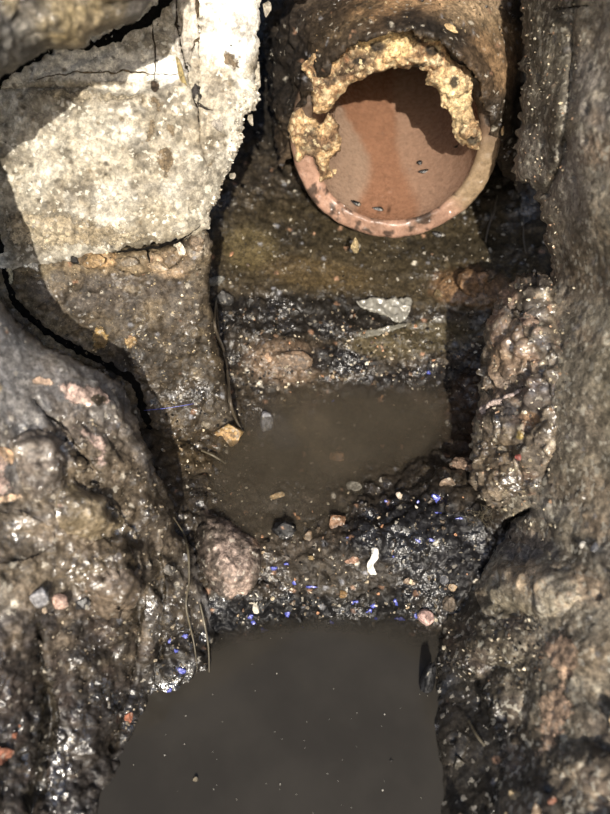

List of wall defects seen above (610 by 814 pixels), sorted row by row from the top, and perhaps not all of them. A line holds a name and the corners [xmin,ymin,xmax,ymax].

crack [0,0,211,122]
crack [112,226,200,263]
crack [0,234,153,430]
leakage [129,592,146,684]
leakage [24,621,59,814]